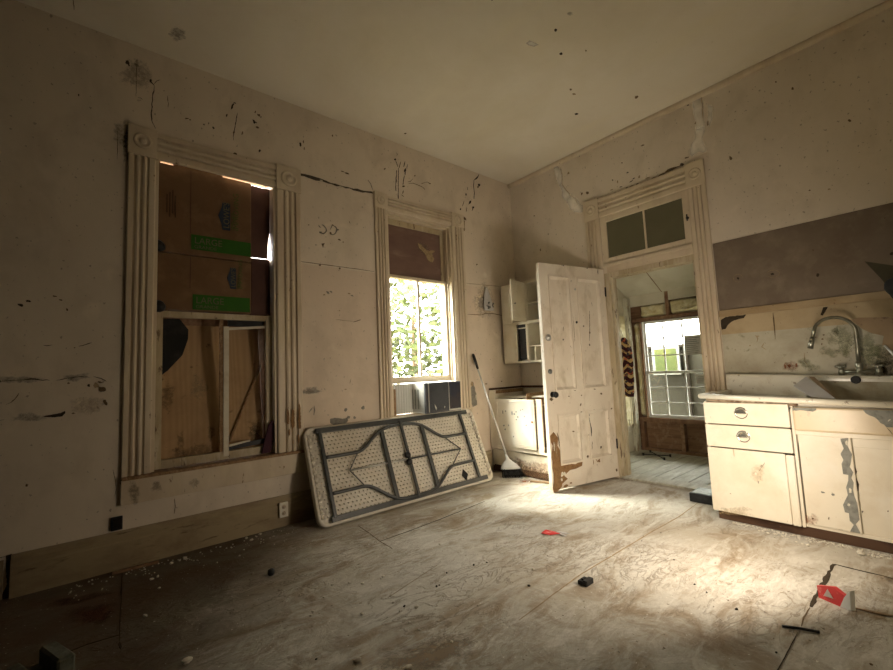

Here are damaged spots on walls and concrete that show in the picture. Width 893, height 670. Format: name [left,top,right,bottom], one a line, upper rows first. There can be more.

crack [149,79,169,127]
peeling [550,432,600,492]